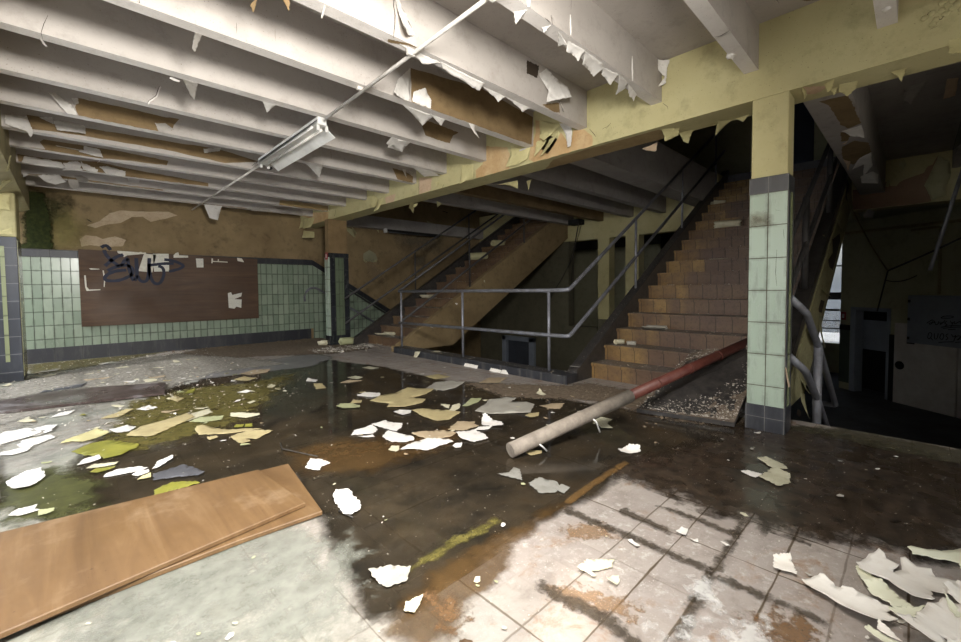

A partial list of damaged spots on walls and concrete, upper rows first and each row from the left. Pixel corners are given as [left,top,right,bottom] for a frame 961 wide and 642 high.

peeling [542,25,637,101]
peeling [0,92,257,211]
peeling [386,39,694,190]
peeling [715,114,749,136]
peeling [801,79,879,184]
peeling [80,210,177,247]
peeling [203,200,329,238]
peeling [818,288,830,348]
peeling [785,367,811,417]